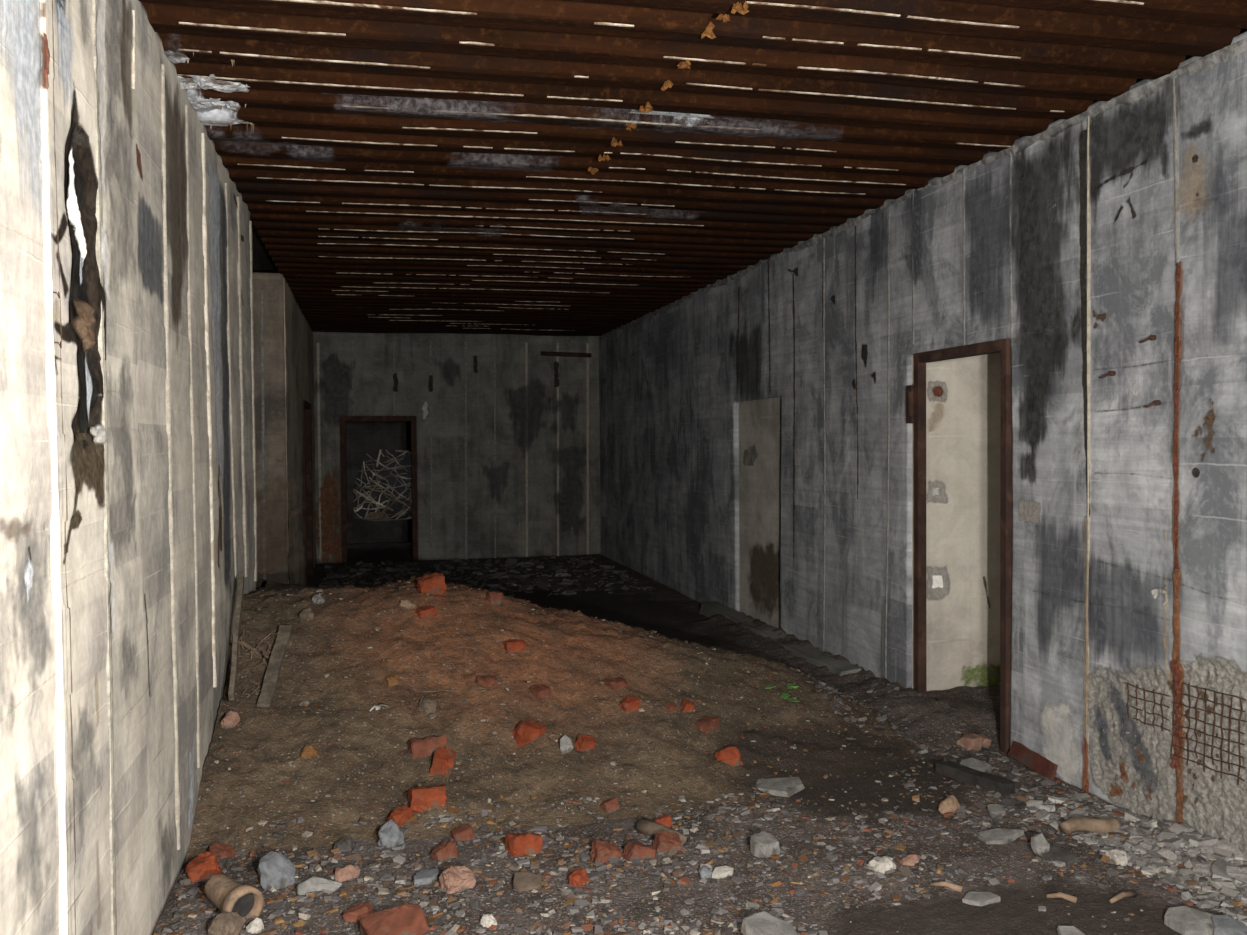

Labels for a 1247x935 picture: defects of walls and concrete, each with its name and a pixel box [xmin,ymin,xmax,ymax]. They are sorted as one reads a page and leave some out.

spalling [96,0,106,192]
spalling [101,223,110,297]
damp [105,0,921,340]
damp [797,67,1025,87]
damp [1053,311,1081,366]
damp [1020,445,1036,482]
corrosion [1170,262,1185,824]
spalling [1085,654,1247,856]